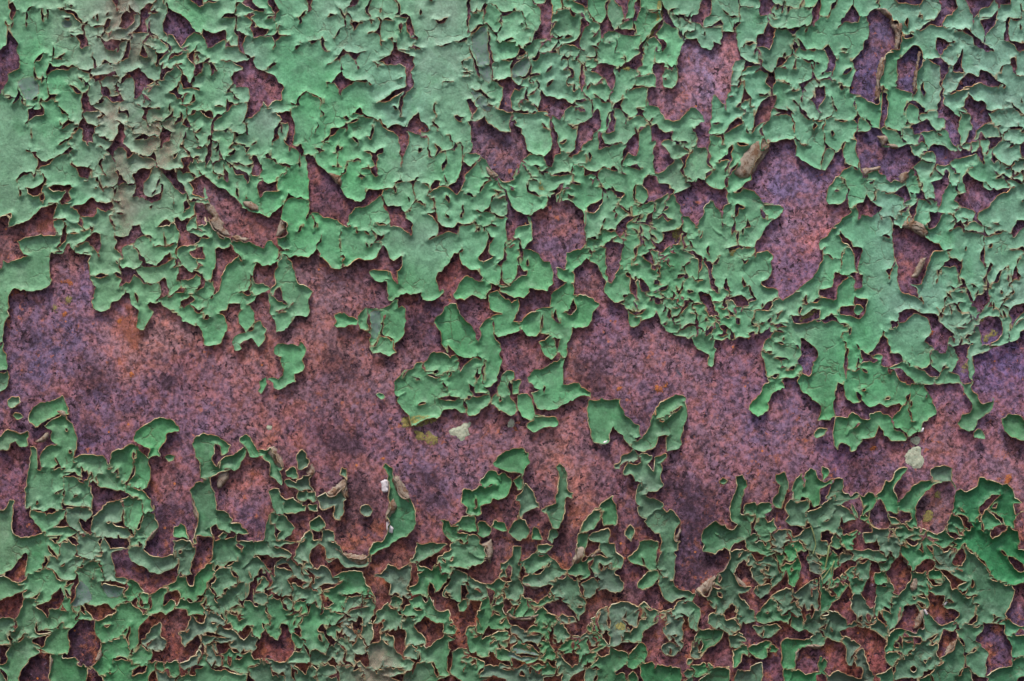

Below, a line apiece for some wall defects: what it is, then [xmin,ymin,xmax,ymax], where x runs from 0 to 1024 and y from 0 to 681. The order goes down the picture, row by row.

peeling [0,0,1024,452]
rust [0,148,1024,681]
peeling [0,394,1024,681]